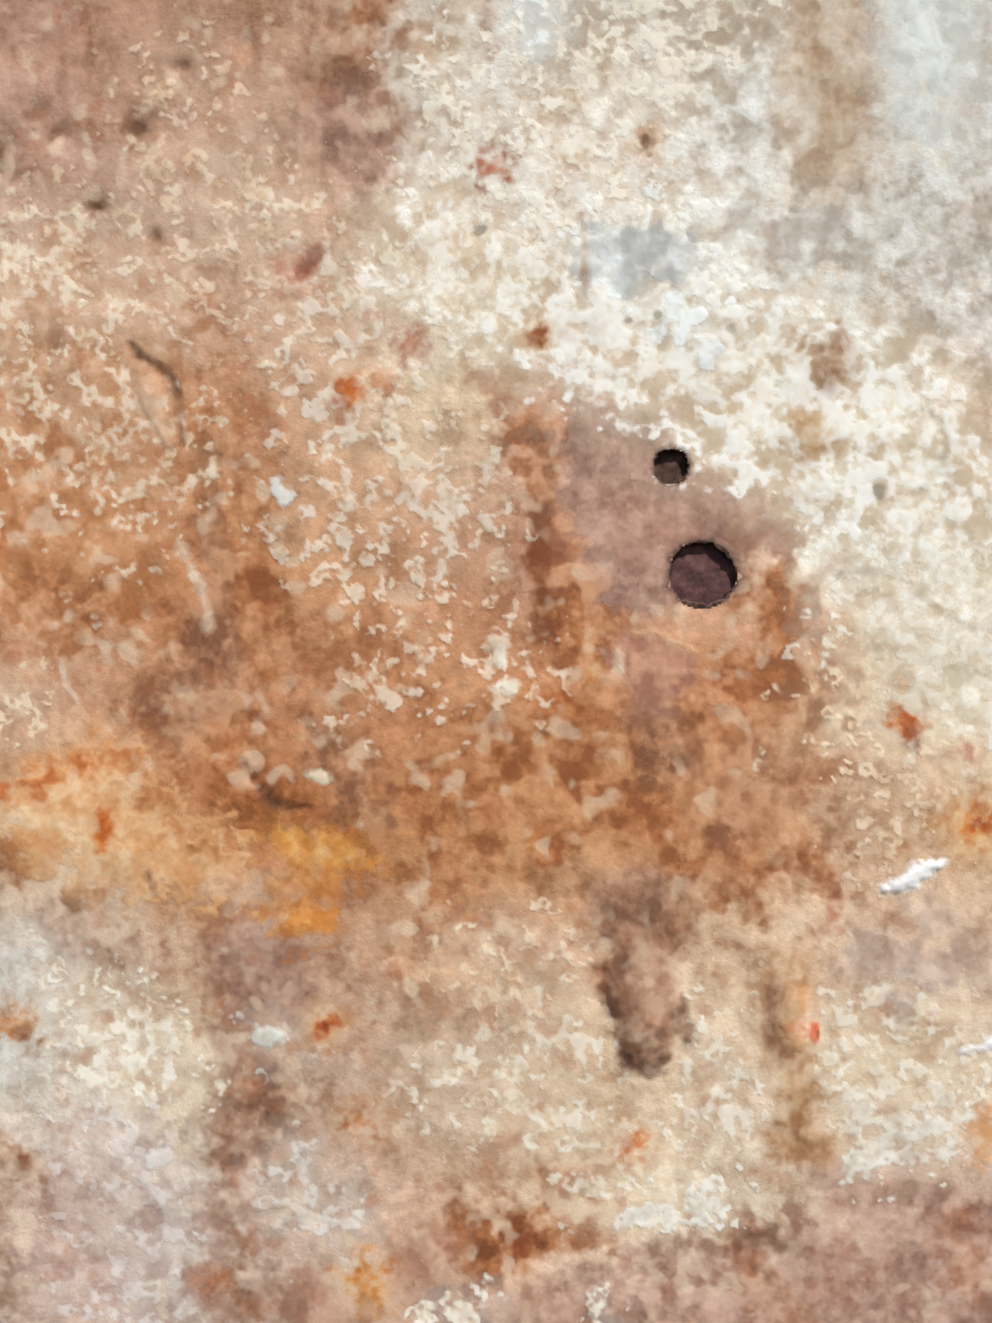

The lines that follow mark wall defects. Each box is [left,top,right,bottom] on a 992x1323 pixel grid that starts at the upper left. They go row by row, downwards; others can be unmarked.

damp [785,0,873,190]
rust [809,344,845,384]
rust [0,493,151,630]
peeling [271,478,292,504]
rust [500,388,621,674]
rust [722,540,838,731]
rust [888,712,918,739]
rust [141,408,387,1323]
rust [554,693,831,908]
rust [446,1200,965,1323]
rust [925,1189,992,1239]
rust [952,1292,992,1323]